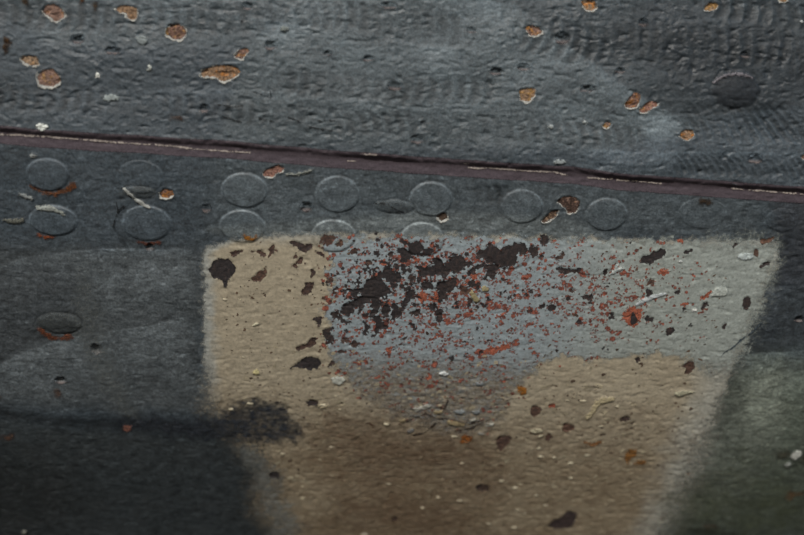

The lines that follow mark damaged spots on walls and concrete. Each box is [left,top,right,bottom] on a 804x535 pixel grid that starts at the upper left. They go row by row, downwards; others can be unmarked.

peeling [42,4,67,23]
peeling [114,5,139,22]
peeling [165,23,187,42]
peeling [19,55,61,90]
peeling [519,87,536,104]
peeling [624,92,660,114]
peeling [541,196,580,224]
peeling [292,232,779,436]
leakage [119,398,301,534]